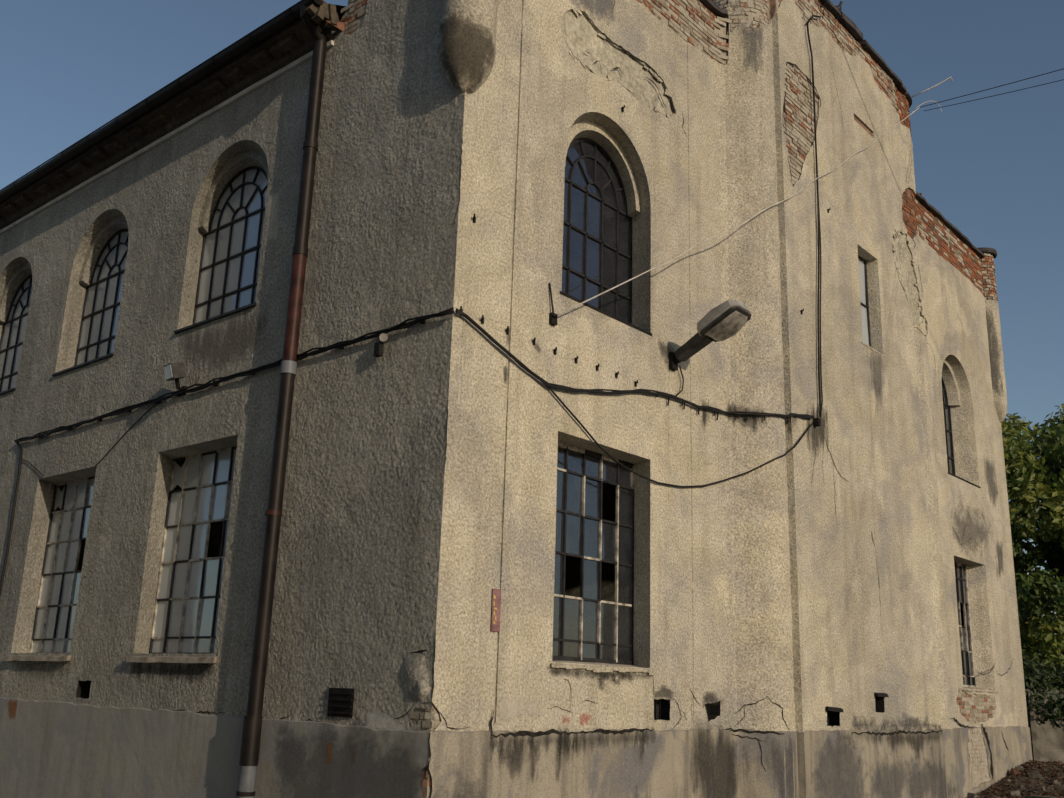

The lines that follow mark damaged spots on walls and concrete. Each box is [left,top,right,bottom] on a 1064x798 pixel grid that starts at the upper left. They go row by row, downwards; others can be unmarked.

water stain [440,15,495,92]
peeling [561,7,676,120]
flaking render [637,0,911,134]
flaking render [782,62,821,187]
flaking render [892,187,984,335]
water stain [500,718,604,776]
crack [411,632,701,773]
water stain [694,729,736,798]
crack [725,696,789,771]
water stain [854,718,940,753]
crack [851,717,1008,778]
spalling [956,689,997,787]